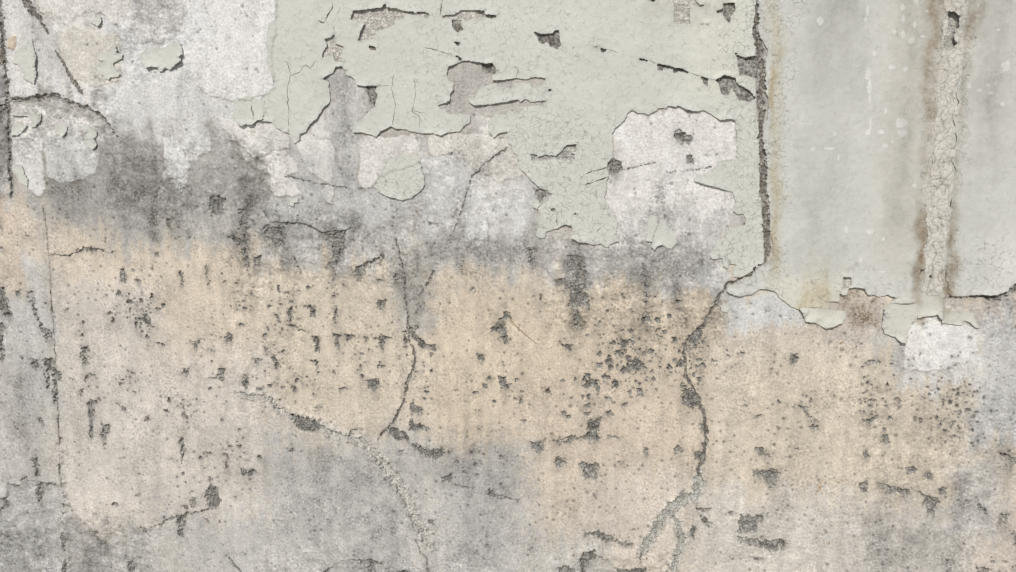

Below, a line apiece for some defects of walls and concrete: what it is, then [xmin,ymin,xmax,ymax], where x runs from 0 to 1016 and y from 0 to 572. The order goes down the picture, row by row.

crack [0,0,121,199]
crack [43,208,116,572]
peeling [138,43,183,72]
crack [235,147,507,572]
peeling [232,0,1016,504]
crack [585,163,671,185]
crack [639,0,771,572]
crack [944,270,1016,301]
spalling [859,466,947,518]